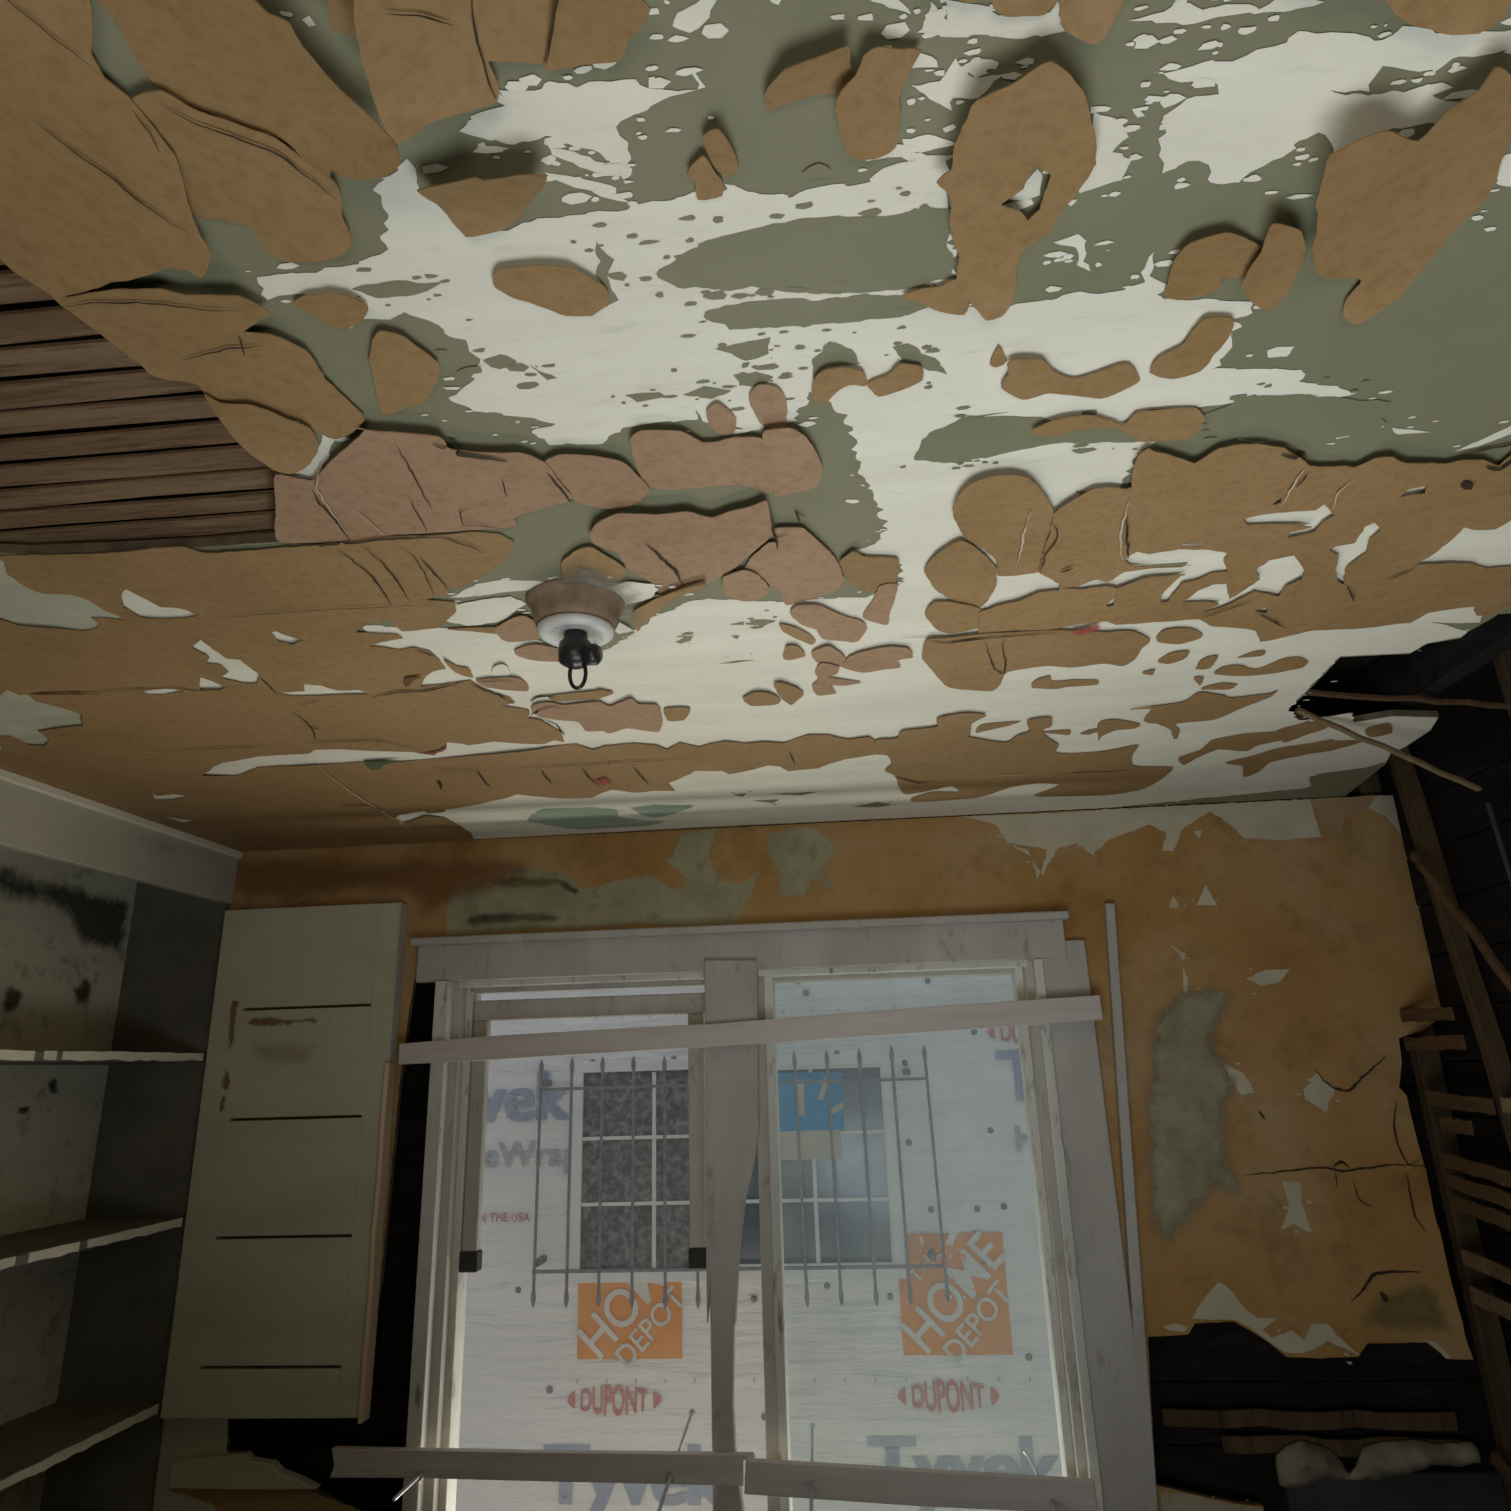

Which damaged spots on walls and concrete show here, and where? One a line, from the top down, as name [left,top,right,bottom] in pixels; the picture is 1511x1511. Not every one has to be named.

flaking render [0,0,1511,935]
crack [206,439,517,619]
crack [644,544,684,592]
crack [1119,502,1130,561]
water stain [0,869,127,949]
flaking render [1246,968,1289,994]
peeling [1148,945,1255,1239]
flaking render [1295,1073,1339,1113]
crack [1245,1099,1427,1233]
flaking render [1281,1181,1312,1233]
flaking render [1164,1283,1360,1364]
crack [1350,1270,1421,1303]